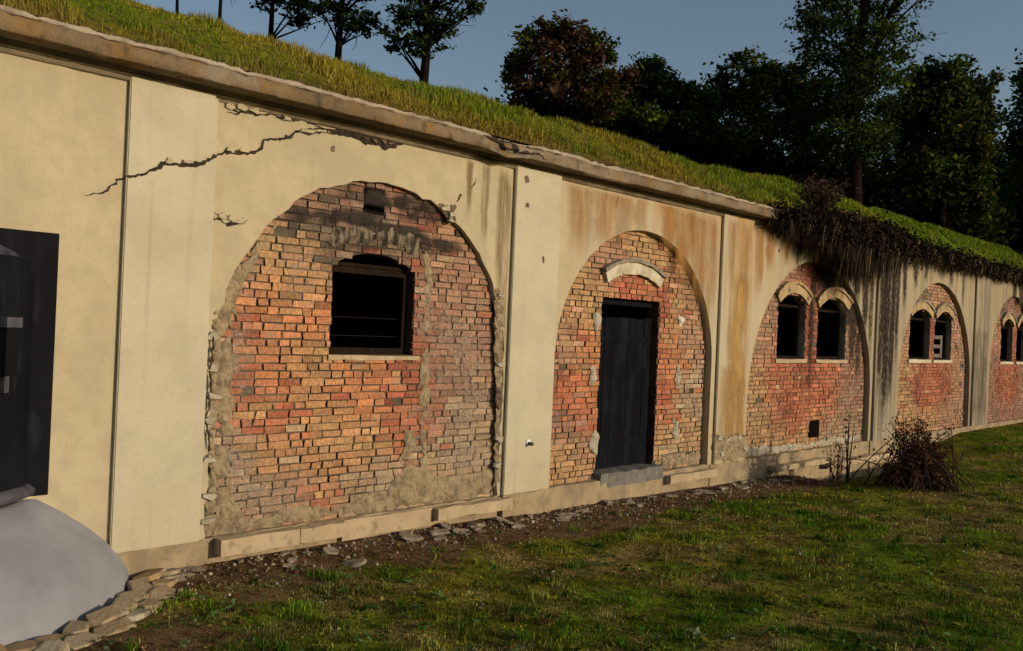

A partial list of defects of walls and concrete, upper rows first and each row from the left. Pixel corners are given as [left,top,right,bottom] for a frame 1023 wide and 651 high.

crack [85,96,338,196]
spalling [214,212,247,227]
spalling [438,193,462,224]
peeling [328,224,433,334]
peeling [593,312,602,332]
leakage [786,236,928,400]
spalling [200,223,279,537]
peeling [398,348,431,468]
spalling [493,288,507,487]
peeling [590,366,598,387]
peeling [589,430,600,457]